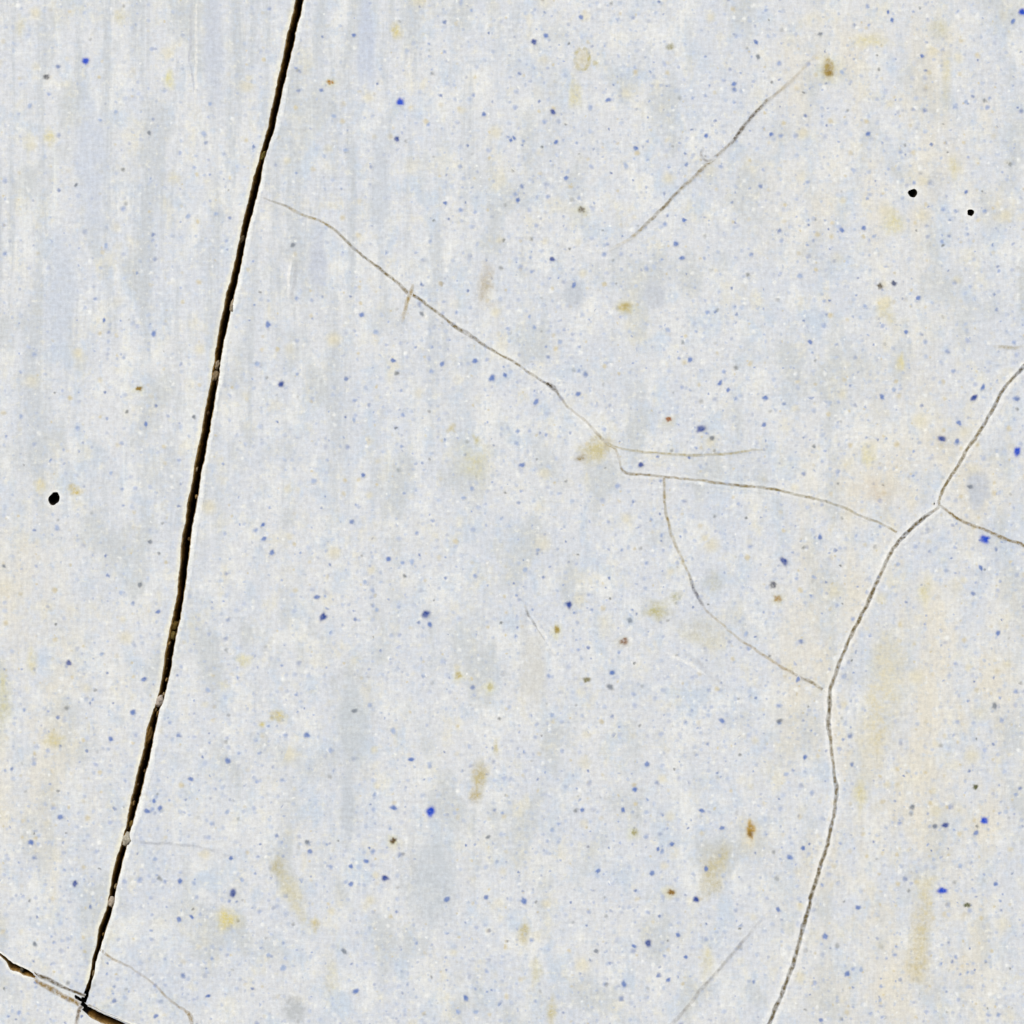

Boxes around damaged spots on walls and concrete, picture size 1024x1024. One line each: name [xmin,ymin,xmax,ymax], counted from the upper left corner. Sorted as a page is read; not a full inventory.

crack [0,0,308,1024]
crack [262,195,1024,1024]
crack [607,50,821,252]